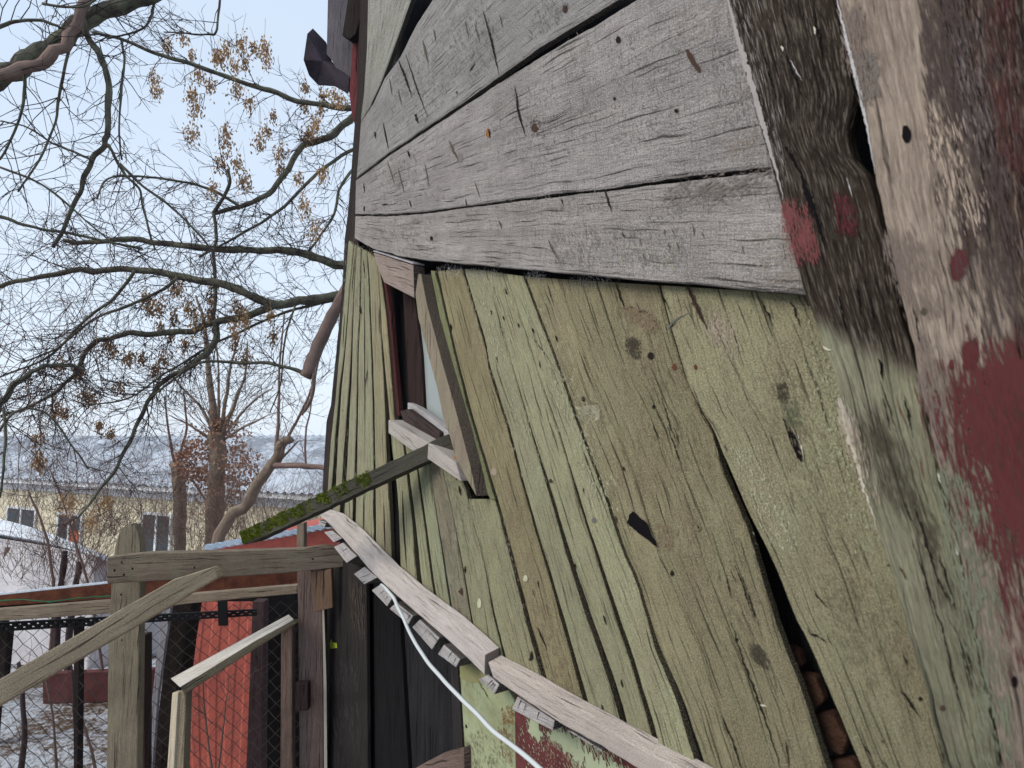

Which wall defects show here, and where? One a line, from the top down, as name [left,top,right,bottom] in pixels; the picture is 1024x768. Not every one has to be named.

peeling [781,197,821,271]
peeling [914,297,1024,690]
crack [718,566,790,768]
crack [807,612,856,649]
peeling [518,718,629,768]